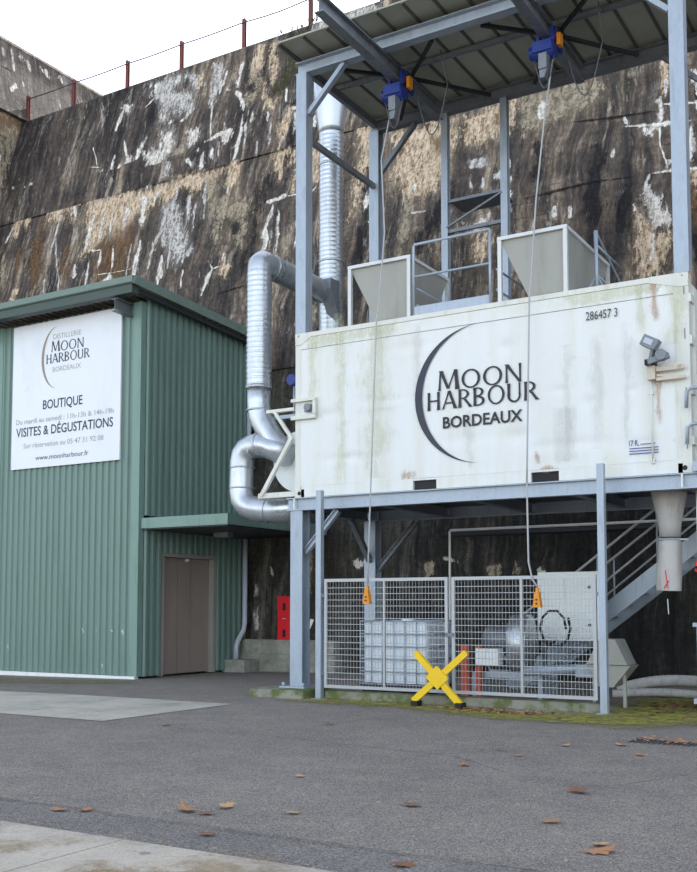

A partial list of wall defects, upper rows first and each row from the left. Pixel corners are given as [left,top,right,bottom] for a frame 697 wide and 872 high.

leakage [1,47,63,83]
leakage [98,62,296,172]
leakage [0,128,19,193]
leakage [50,209,63,291]
leakage [71,249,114,285]
leakage [126,169,209,288]
leakage [238,171,286,281]